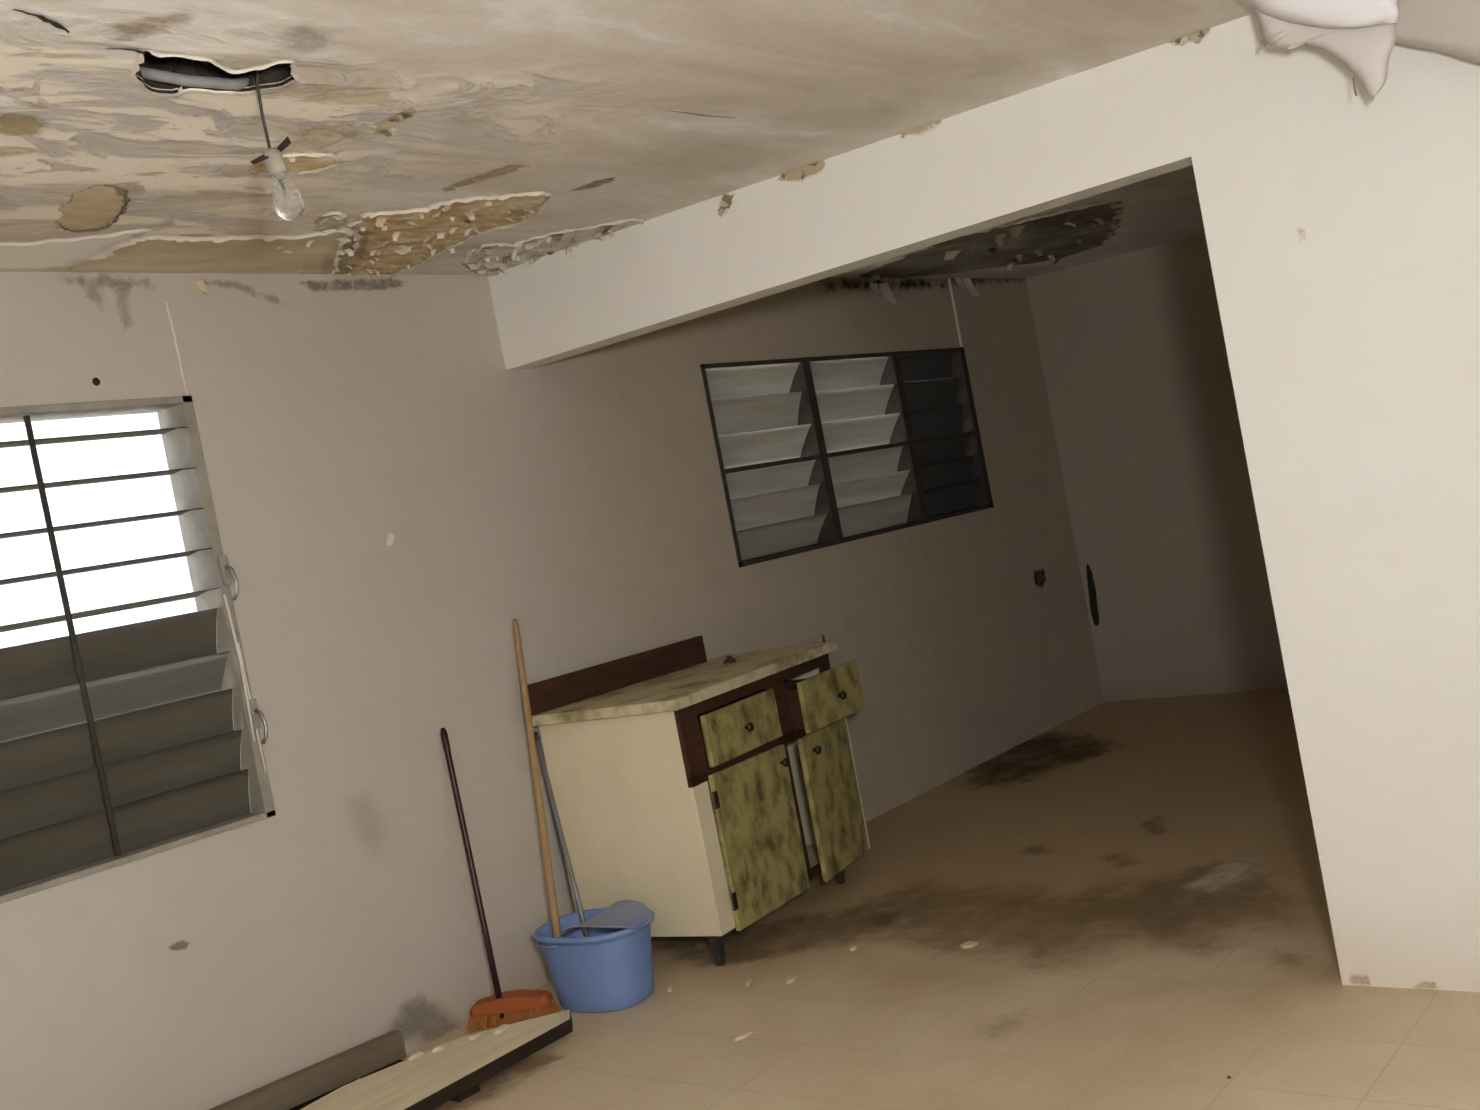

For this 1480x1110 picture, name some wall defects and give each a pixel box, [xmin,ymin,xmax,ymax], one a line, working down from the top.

spalling [131,50,301,99]
peeling [375,109,415,137]
peeling [282,152,342,174]
peeling [56,185,131,233]
peeling [69,191,645,295]
peeling [859,199,1128,305]
water stain [974,734,1106,785]